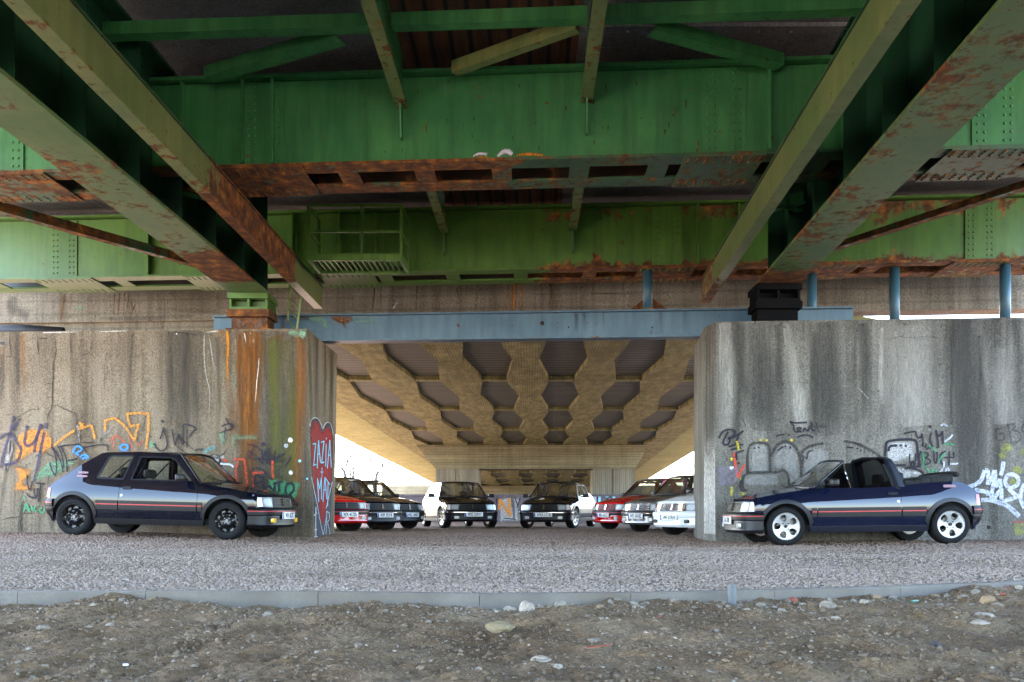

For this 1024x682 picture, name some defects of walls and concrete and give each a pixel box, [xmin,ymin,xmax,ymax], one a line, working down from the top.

corrosion [219,331,260,469]
damp [255,355,307,537]
damp [951,319,981,491]